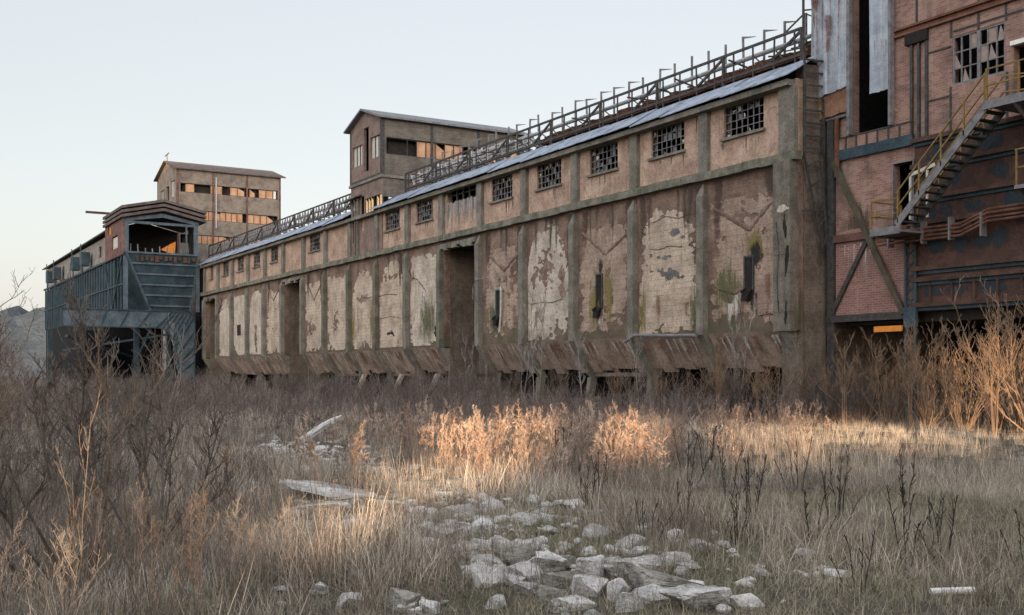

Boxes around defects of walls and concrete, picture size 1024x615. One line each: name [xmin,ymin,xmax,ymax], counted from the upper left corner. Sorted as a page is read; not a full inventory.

rust [811,0,840,72]
peeling [305,253,436,352]
peeling [485,208,696,341]
peeling [710,191,789,324]